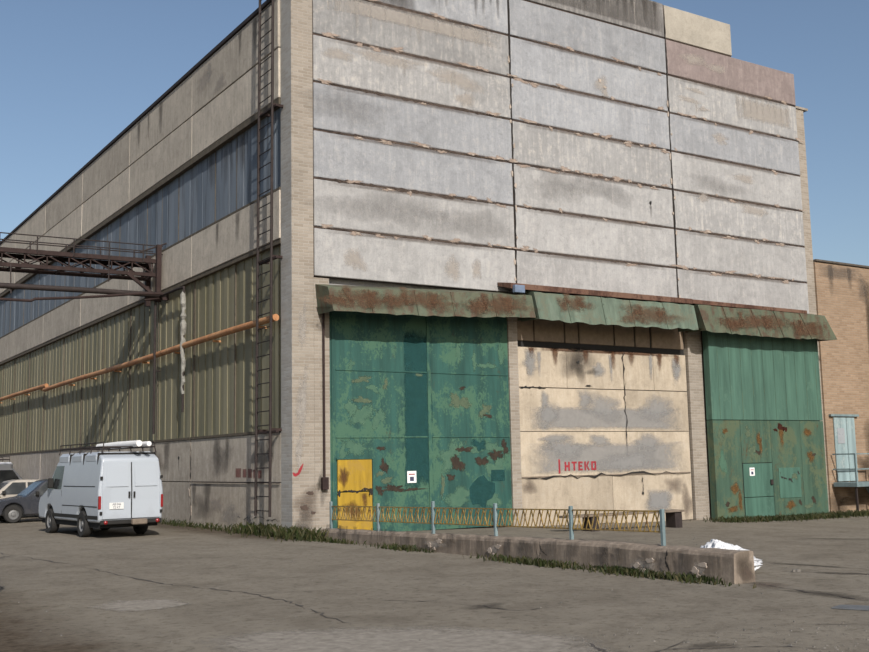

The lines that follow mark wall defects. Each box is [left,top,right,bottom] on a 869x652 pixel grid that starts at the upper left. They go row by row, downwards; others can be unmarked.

leakage [354,2,480,43]
corrosion [324,286,454,312]
corrosion [623,304,680,324]
crack [620,349,628,444]
crack [525,469,685,495]